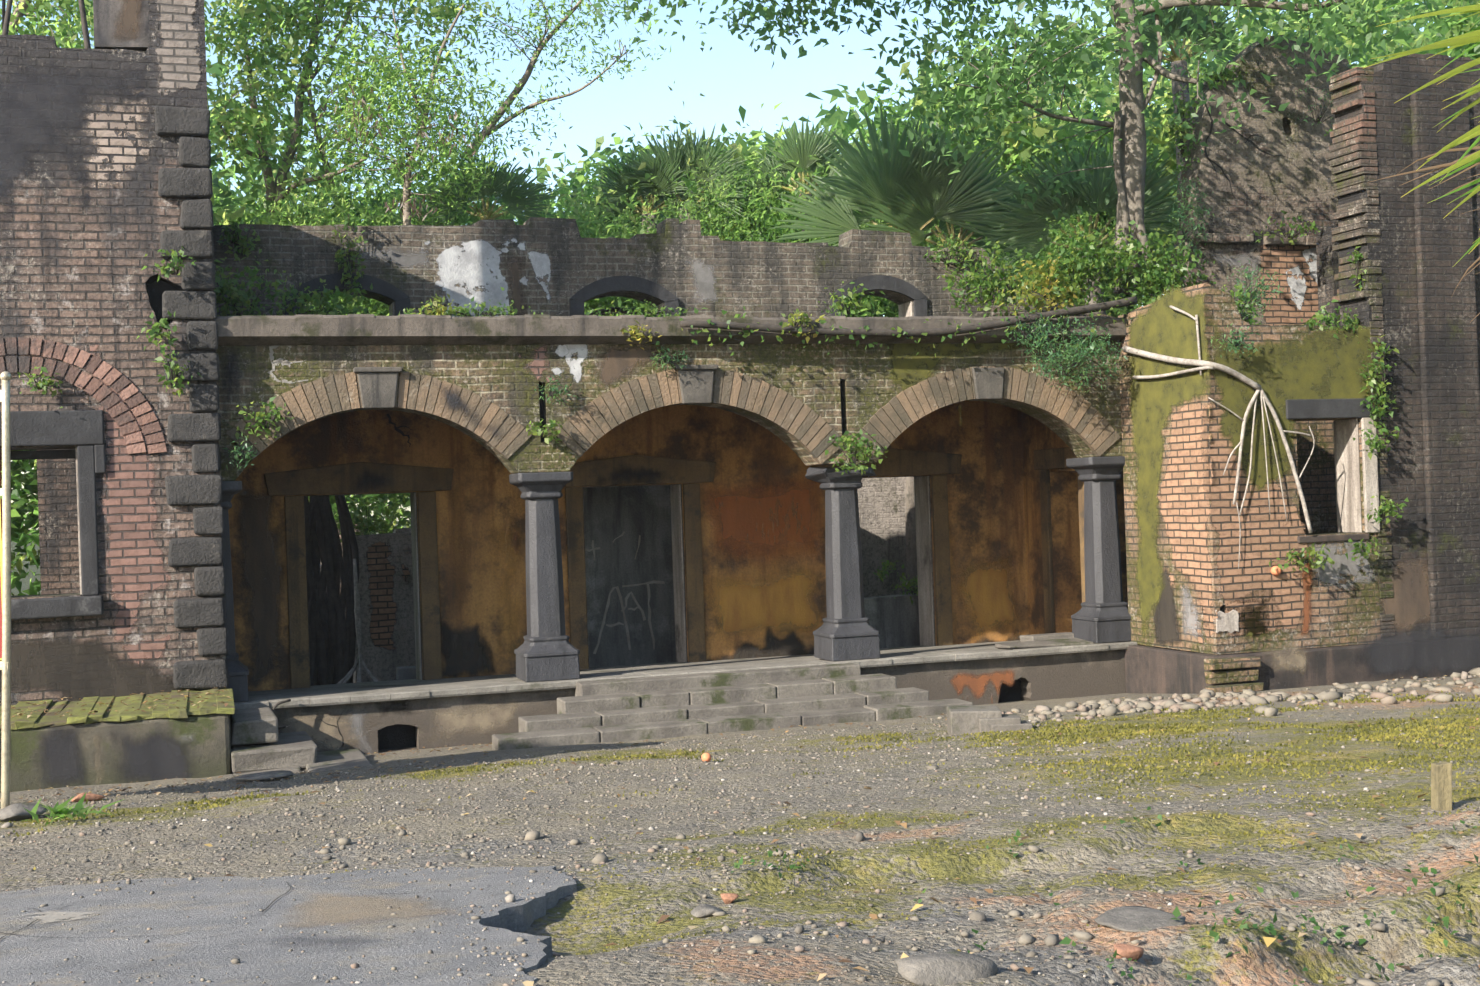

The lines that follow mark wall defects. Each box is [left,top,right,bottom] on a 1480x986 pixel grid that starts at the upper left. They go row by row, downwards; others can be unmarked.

peeling [422,238,551,317]
peeling [518,344,588,383]
peeling [1157,67,1395,644]
damp [238,489,285,686]
damp [442,623,495,678]
damp [708,629,814,661]